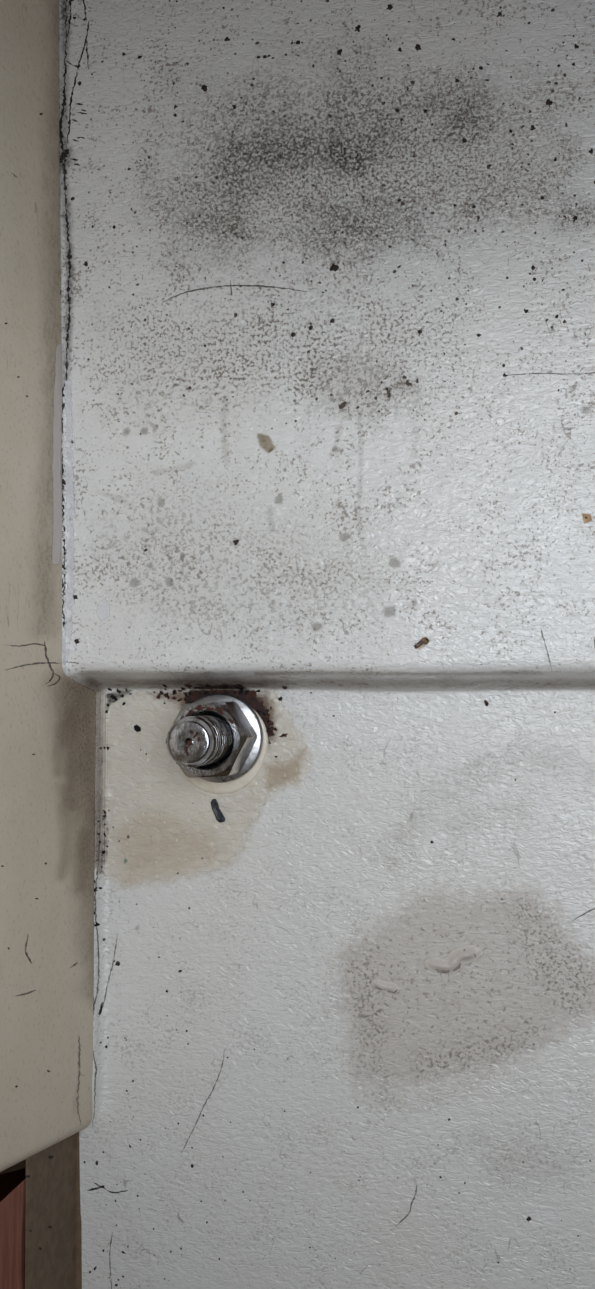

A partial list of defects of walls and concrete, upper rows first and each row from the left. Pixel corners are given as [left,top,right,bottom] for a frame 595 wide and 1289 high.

water stain [113,4,589,316]
rust [153,683,288,758]